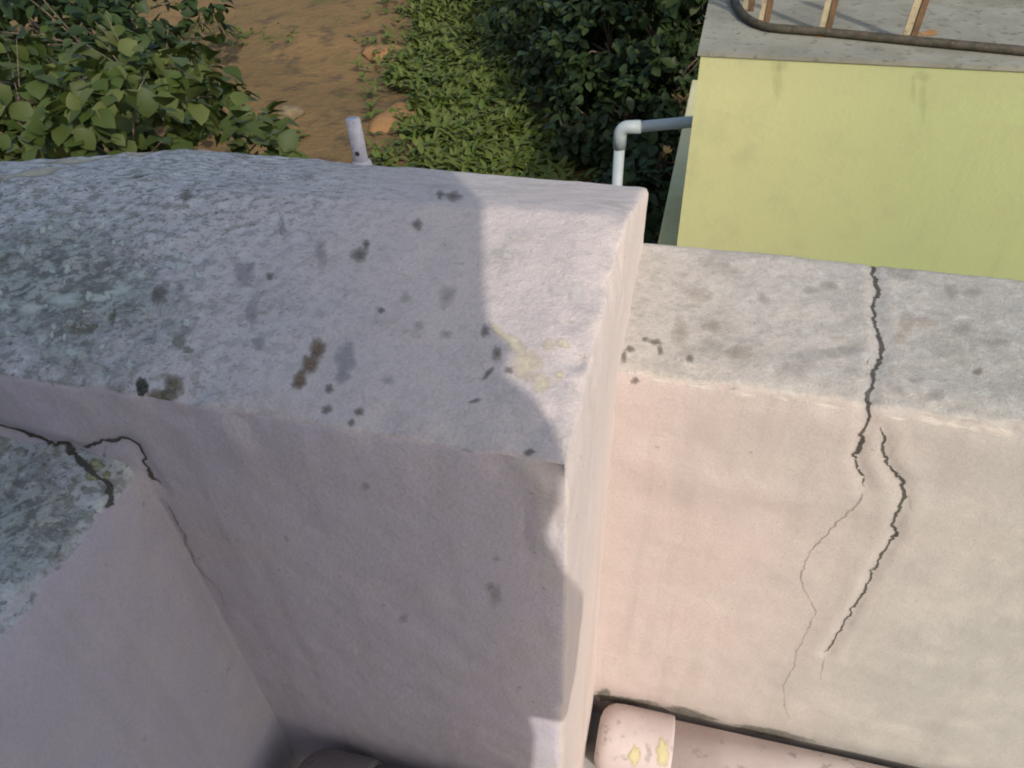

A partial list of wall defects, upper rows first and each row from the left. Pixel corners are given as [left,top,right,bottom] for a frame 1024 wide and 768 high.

water stain [136,378,149,396]
flaking render [0,457,74,579]
crack [0,424,160,508]
crack [825,266,907,652]